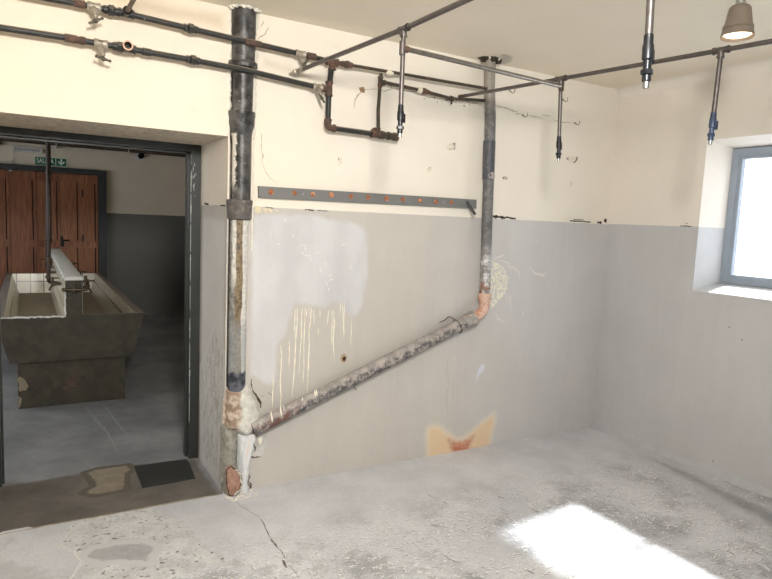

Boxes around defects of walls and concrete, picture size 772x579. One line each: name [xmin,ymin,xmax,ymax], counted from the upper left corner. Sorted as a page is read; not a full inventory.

spalling [250,429,272,462]
flaking render [225,465,242,496]
crack [236,475,298,576]